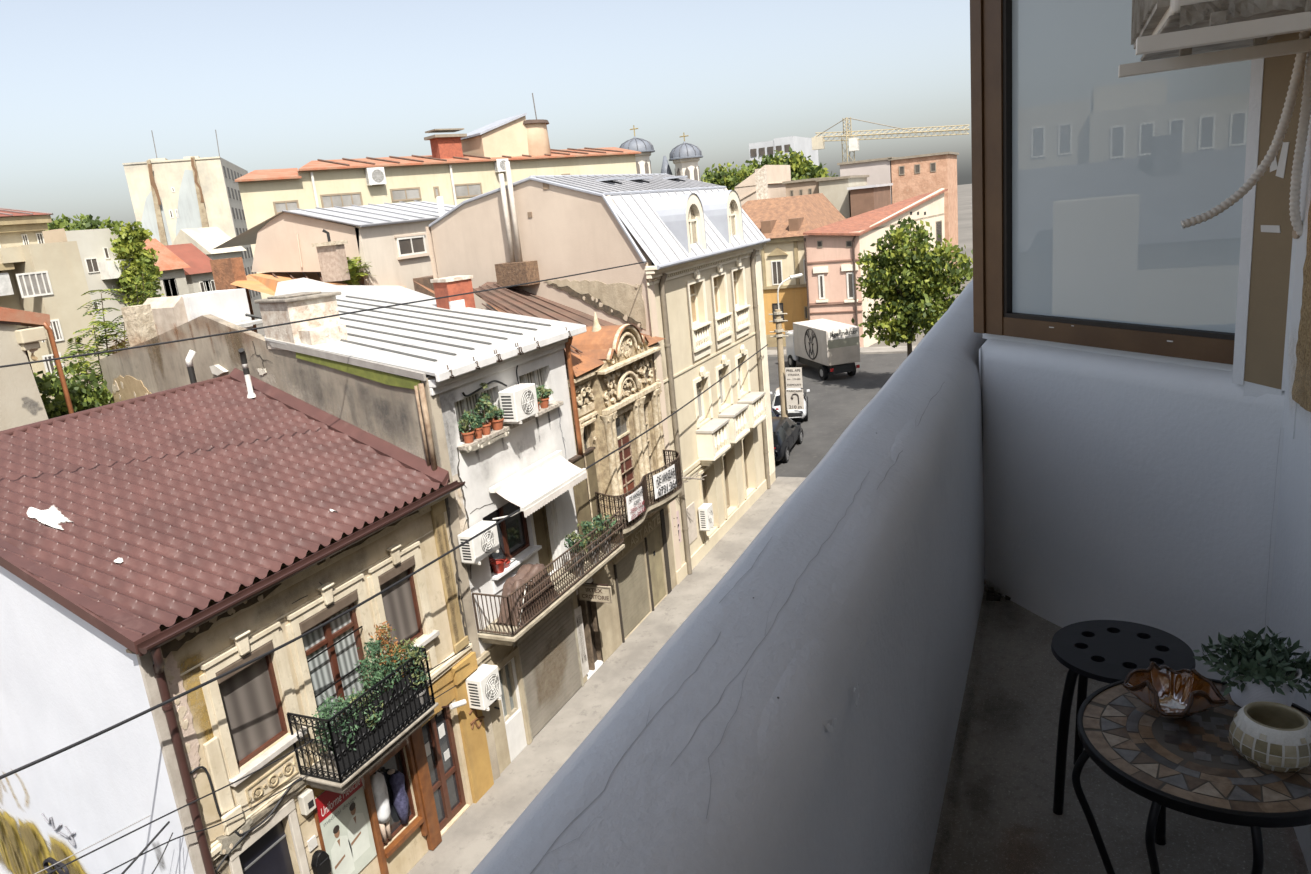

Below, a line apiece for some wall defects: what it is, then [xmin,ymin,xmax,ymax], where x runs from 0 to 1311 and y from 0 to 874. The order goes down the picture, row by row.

crack [446,447,493,642]
crack [530,537,772,874]
crack [671,384,943,819]